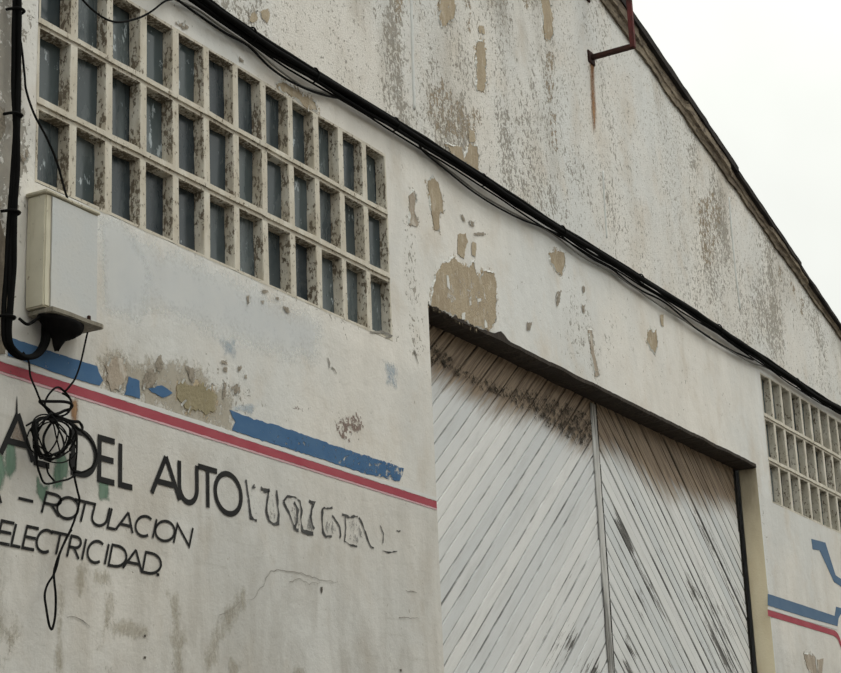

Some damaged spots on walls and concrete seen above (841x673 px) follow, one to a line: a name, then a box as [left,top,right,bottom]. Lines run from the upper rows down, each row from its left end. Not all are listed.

peeling [435,0,457,29]
peeling [540,0,554,42]
peeling [473,25,488,93]
peeling [408,189,420,227]
peeling [424,175,445,234]
peeling [428,214,497,331]
peeling [548,247,566,277]
peeling [142,355,163,390]
peeling [176,364,247,422]
water stain [430,345,592,449]
crack [219,569,336,615]
peeling [803,652,823,673]